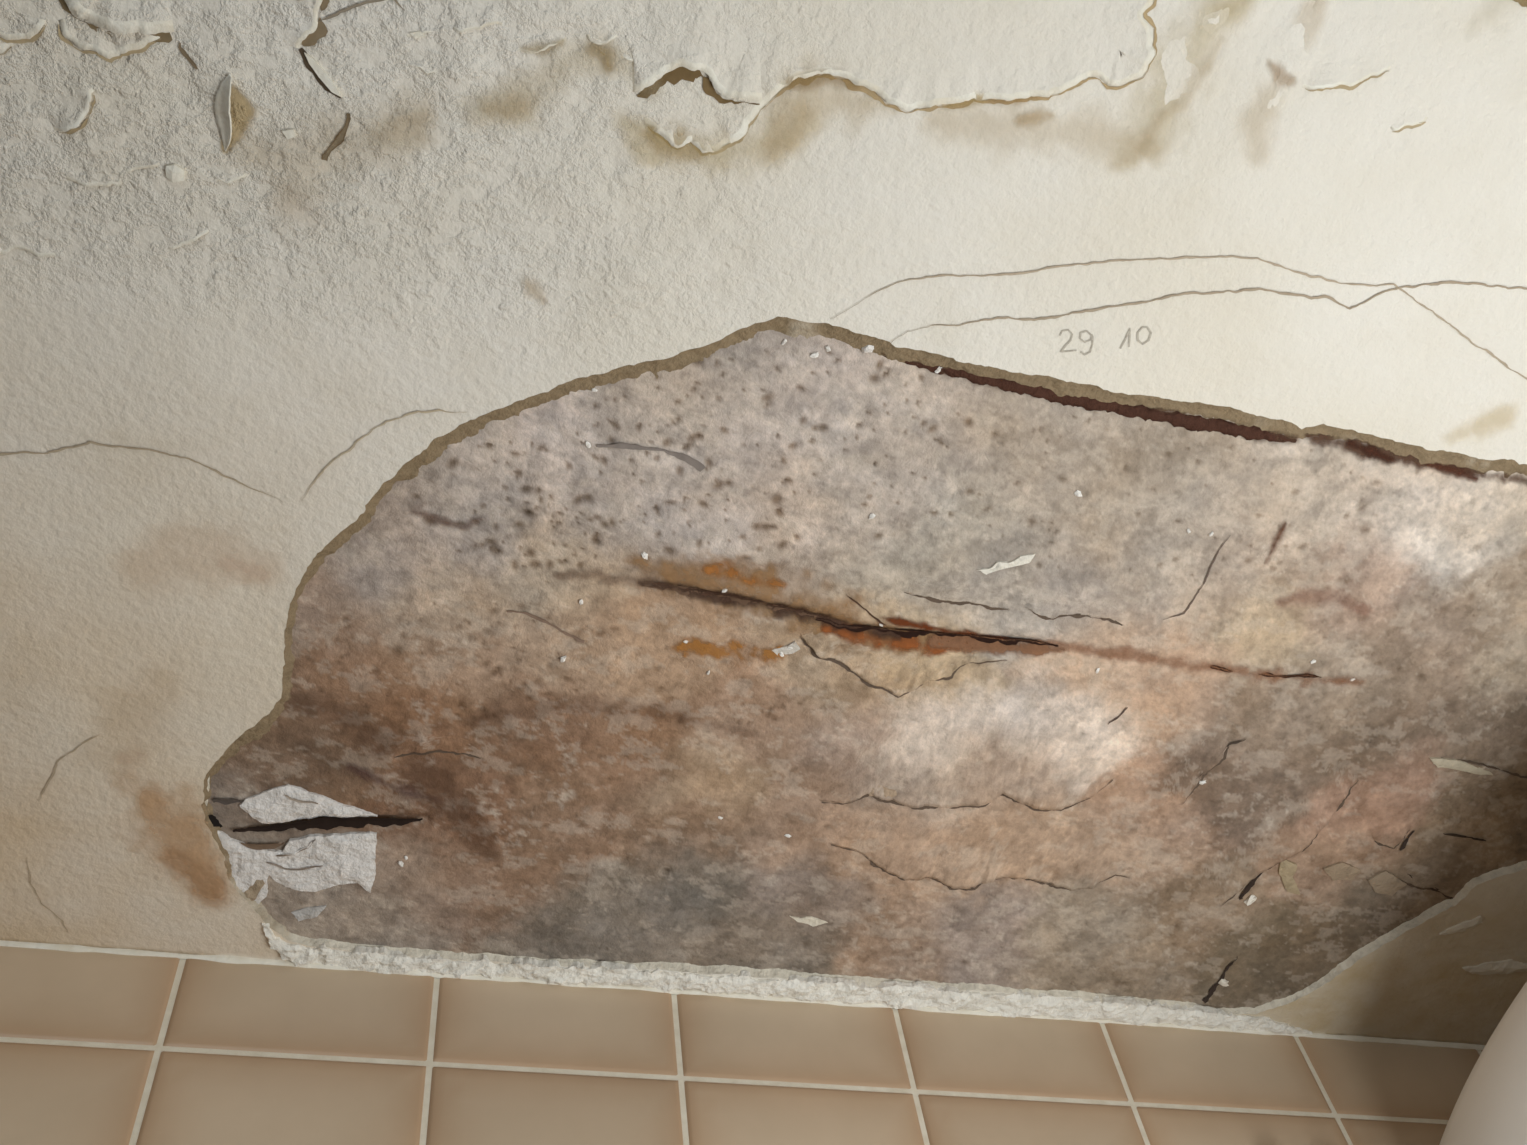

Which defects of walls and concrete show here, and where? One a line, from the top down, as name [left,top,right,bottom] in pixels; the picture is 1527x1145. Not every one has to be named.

peeling [0,0,174,134]
peeling [214,74,254,153]
peeling [264,0,342,98]
peeling [586,0,1157,156]
crack [831,255,1527,380]
crack [642,585,1058,647]
rust [632,558,1156,662]
spalling [201,316,1527,1035]
rust [1202,665,1281,681]
crack [1210,665,1321,678]
water stain [140,791,224,898]
crack [208,795,423,871]